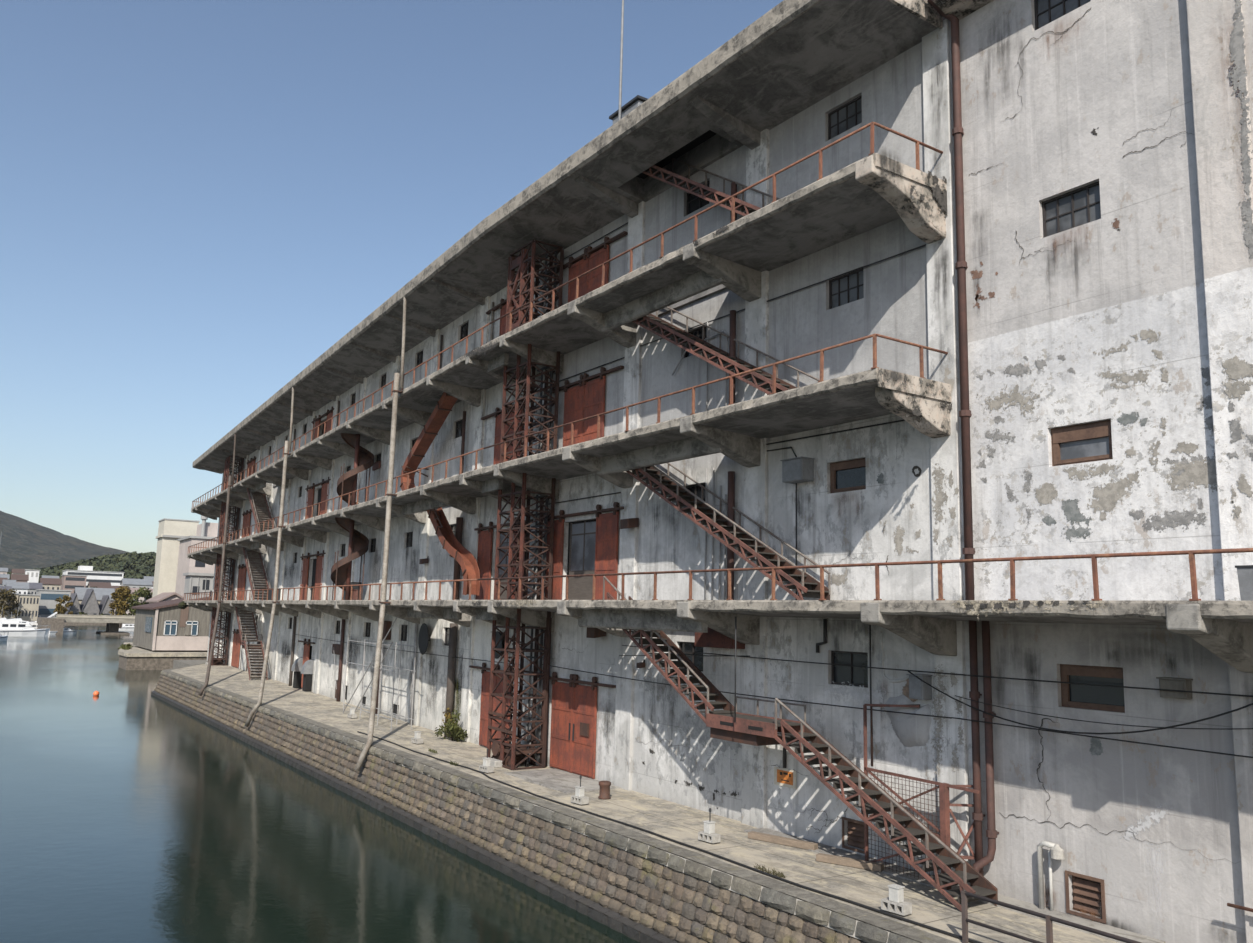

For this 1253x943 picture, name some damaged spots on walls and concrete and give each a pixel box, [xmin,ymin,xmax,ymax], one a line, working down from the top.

crack [1003,8,1091,122]
crack [1123,106,1194,158]
peeling [970,262,998,309]
peeling [1093,329,1171,392]
peeling [976,354,1076,483]
spalling [1005,355,1253,542]
crack [802,807,848,834]
crack [999,718,1238,864]